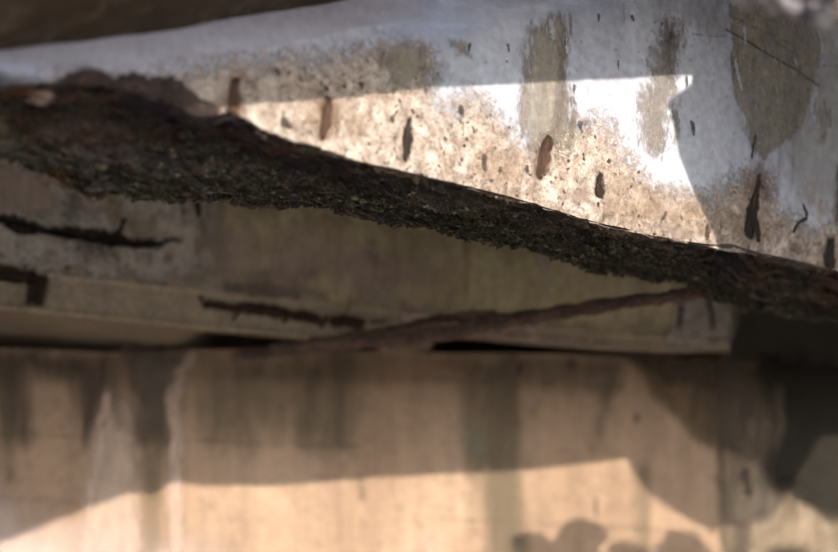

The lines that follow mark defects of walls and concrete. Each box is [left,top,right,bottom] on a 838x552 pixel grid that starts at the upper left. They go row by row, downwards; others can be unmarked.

rust [25,273,48,306]
crack [0,213,182,250]
crack [182,197,201,218]
spalling [0,160,386,330]
spalling [0,32,838,272]
rust [232,287,715,361]
leakage [519,12,578,159]
leakage [638,17,686,155]
leakage [0,344,197,552]
leakage [629,353,838,552]